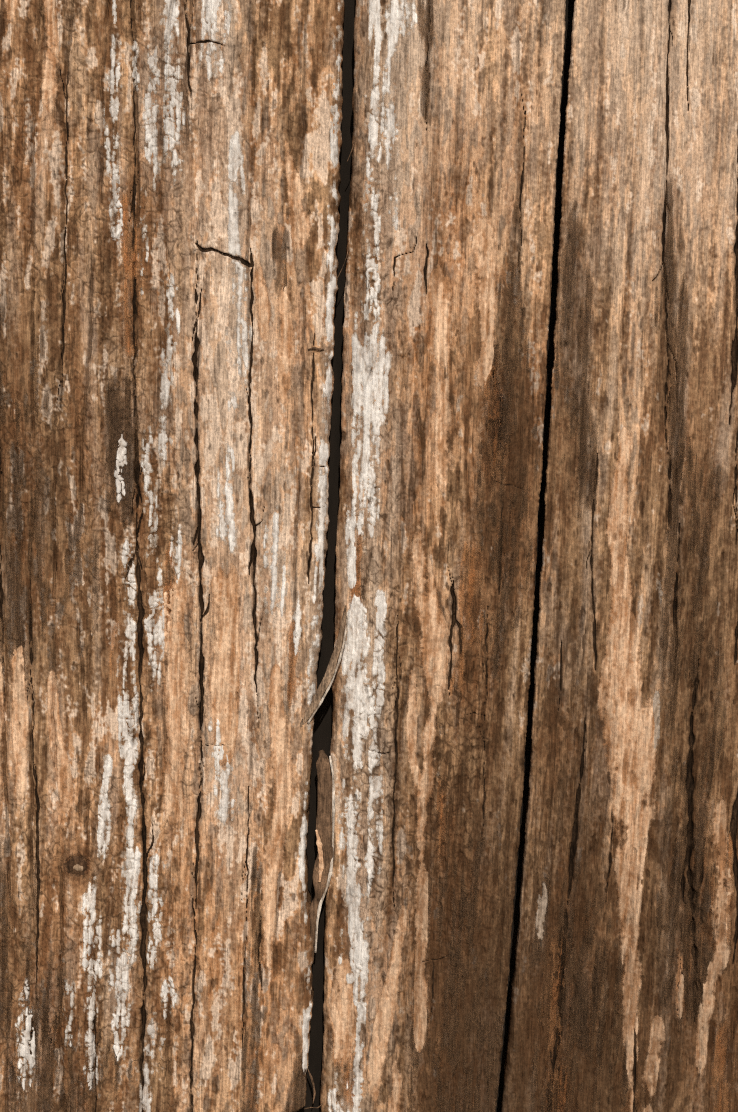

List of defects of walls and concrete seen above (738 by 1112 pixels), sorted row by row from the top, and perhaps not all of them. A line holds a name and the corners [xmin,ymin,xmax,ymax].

crack [189,241,265,1112]
crack [631,1030,639,1112]
crack [652,0,738,1022]